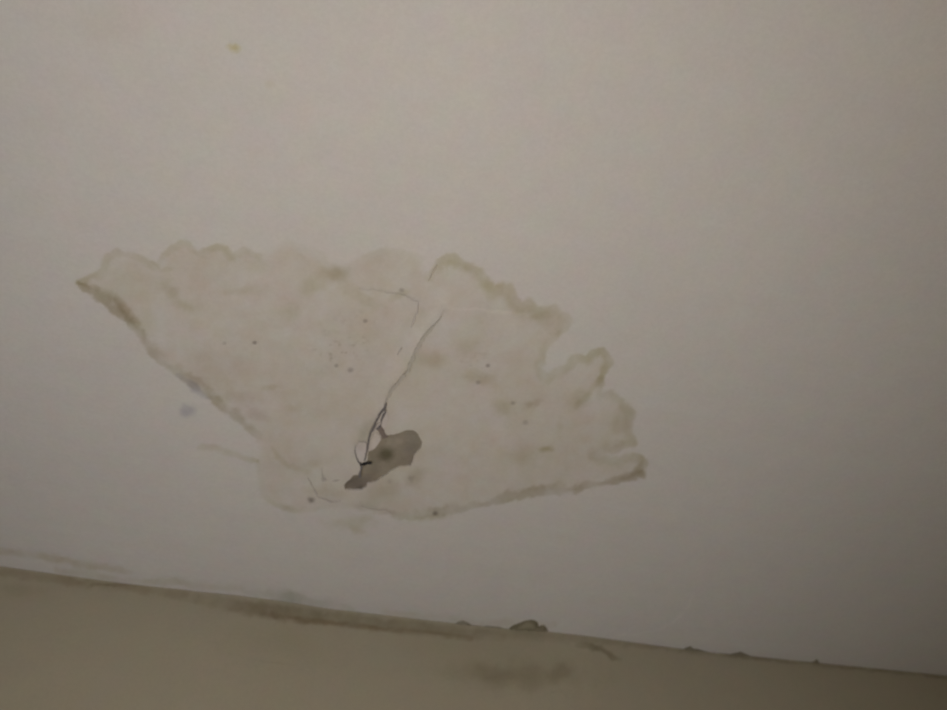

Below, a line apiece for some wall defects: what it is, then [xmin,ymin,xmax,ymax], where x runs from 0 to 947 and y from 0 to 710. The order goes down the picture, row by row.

leakage [73,237,651,538]
crack [307,304,442,515]
flaking render [345,411,422,489]
leakage [0,545,241,594]
leakage [258,607,653,701]